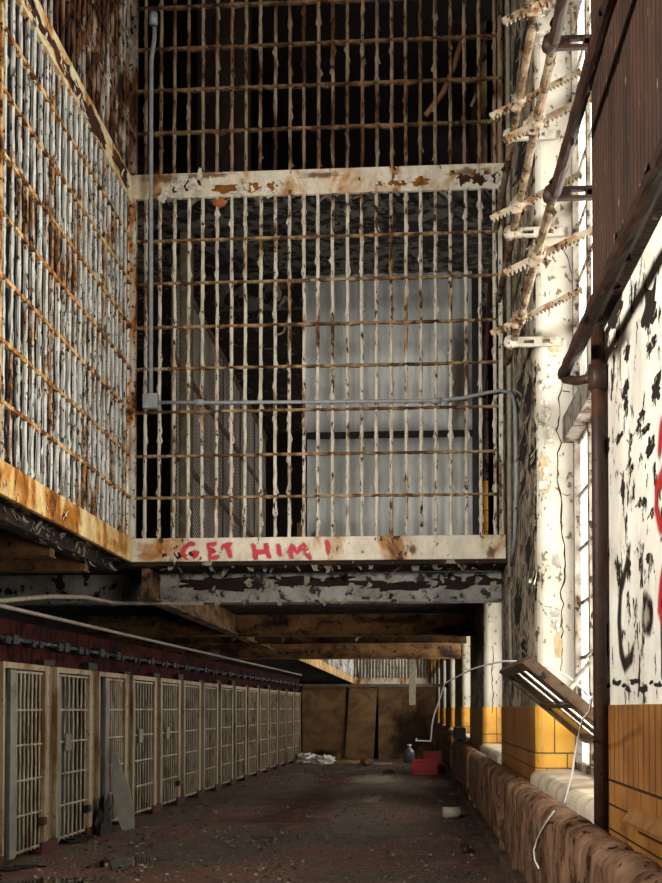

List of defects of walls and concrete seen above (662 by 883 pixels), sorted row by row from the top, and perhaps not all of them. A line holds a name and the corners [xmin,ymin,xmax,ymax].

peeling [320,175,430,202]
peeling [607,294,630,363]
peeling [641,277,657,360]
peeling [605,369,662,460]
peeling [3,501,120,571]
peeling [619,456,634,504]
peeling [635,497,653,519]
peeling [161,547,503,607]
peeling [511,535,537,660]
flaking render [545,606,563,659]